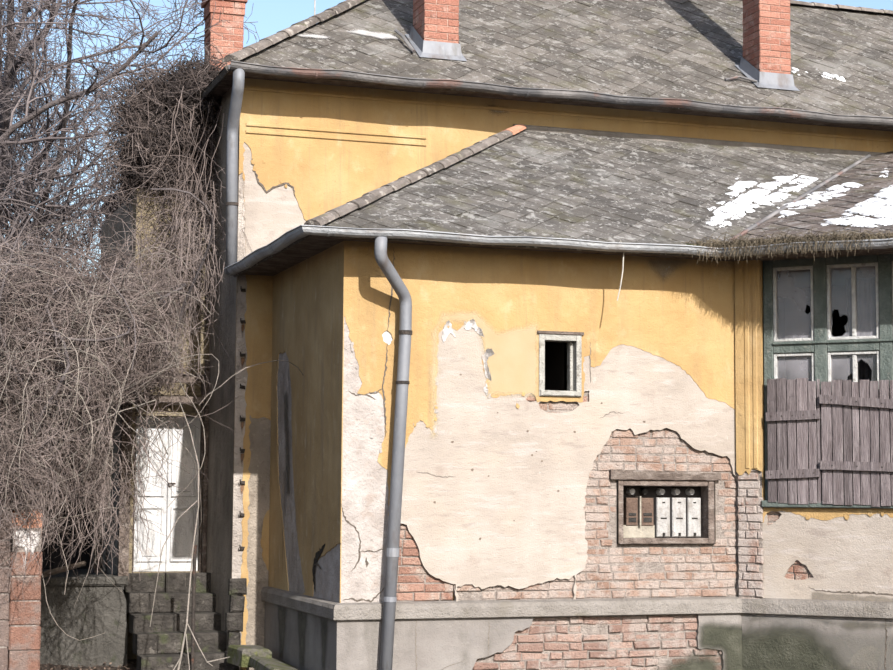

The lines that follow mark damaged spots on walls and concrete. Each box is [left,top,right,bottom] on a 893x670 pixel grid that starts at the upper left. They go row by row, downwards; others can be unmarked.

peeling [237,142,306,262]
crack [349,253,395,436]
spalling [382,330,393,345]
peeling [232,275,389,647]
peeling [396,319,893,602]
crack [312,544,325,591]
crack [341,503,382,572]
crack [344,588,384,602]
spalling [472,614,722,670]